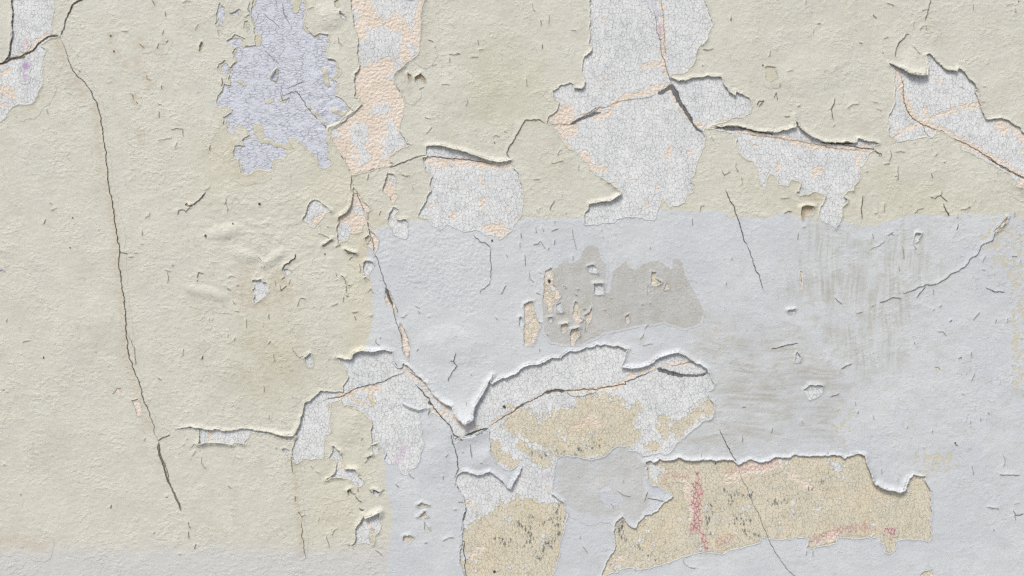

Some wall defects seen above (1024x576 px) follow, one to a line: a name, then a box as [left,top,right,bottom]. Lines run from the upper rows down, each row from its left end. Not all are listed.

peeling [0,0,61,123]
crack [0,0,205,555]
peeling [301,0,525,297]
peeling [174,264,934,576]
crack [276,3,902,576]
peeling [545,0,1024,231]
crack [835,197,1010,335]